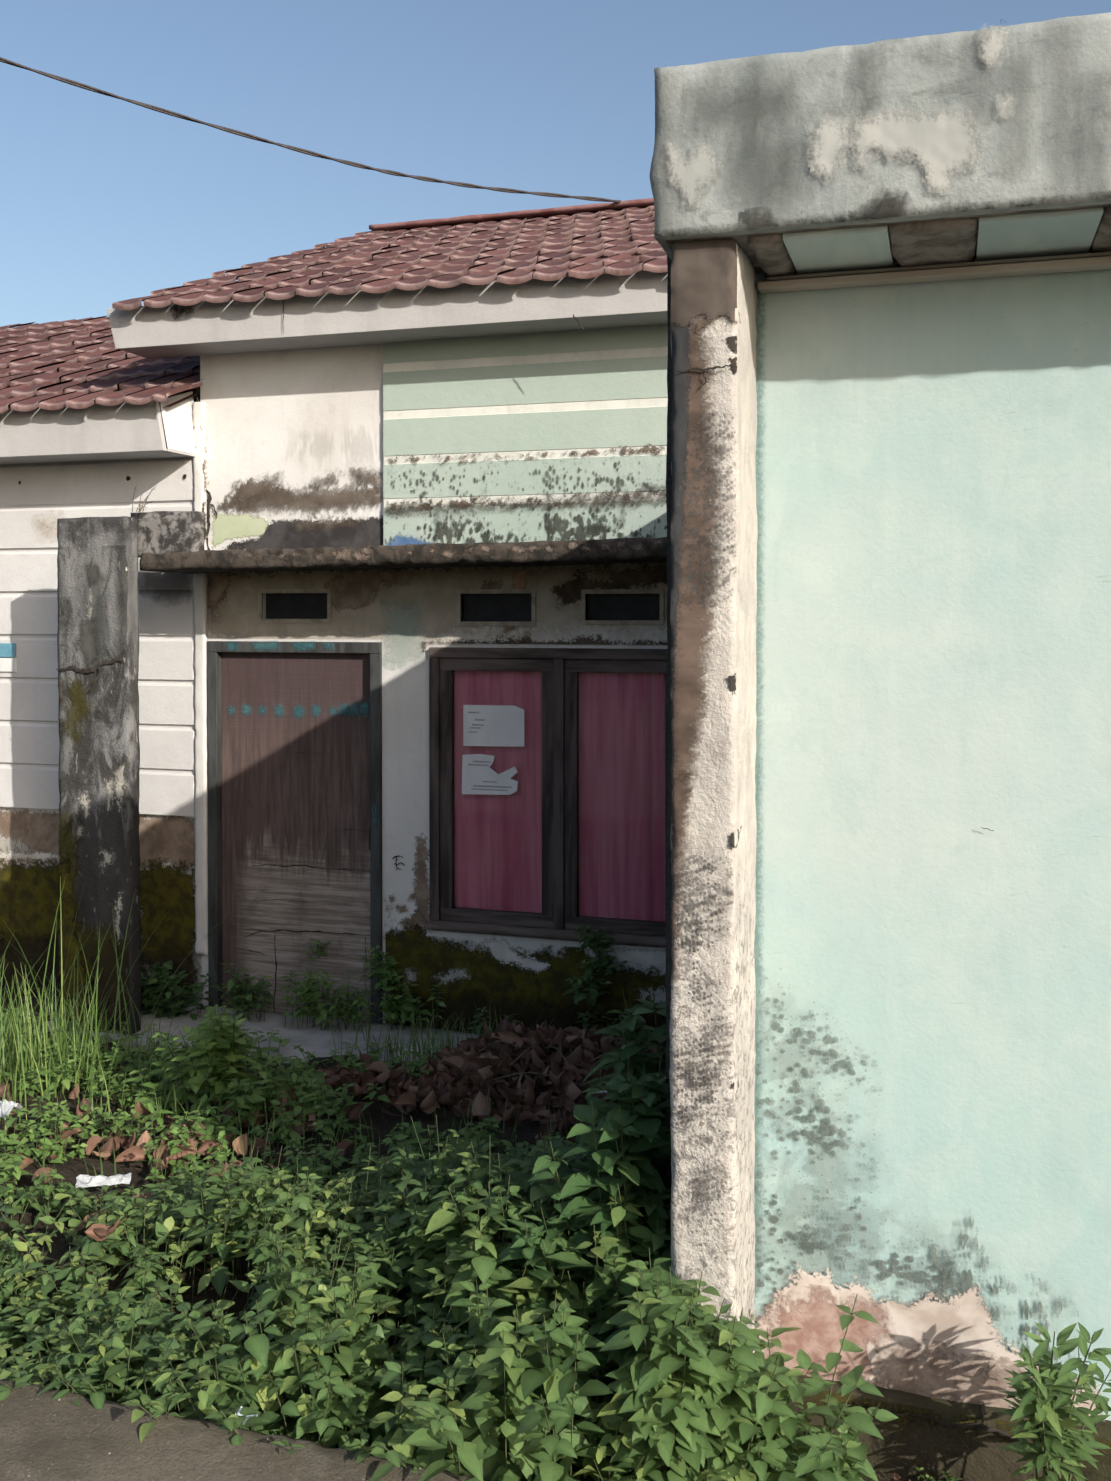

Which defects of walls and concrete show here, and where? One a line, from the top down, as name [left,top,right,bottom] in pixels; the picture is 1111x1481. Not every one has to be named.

peeling [668,141,721,206]
peeling [810,104,985,195]
water stain [811,192,1068,224]
peeling [192,418,666,550]
water stain [79,617,99,667]
water stain [85,545,191,657]
peeling [0,766,125,864]
peeling [139,815,196,876]
water stain [209,208,1062,1363]
peeling [485,937,550,974]
peeling [756,1261,1039,1409]
peeling [1071,1378,1105,1422]